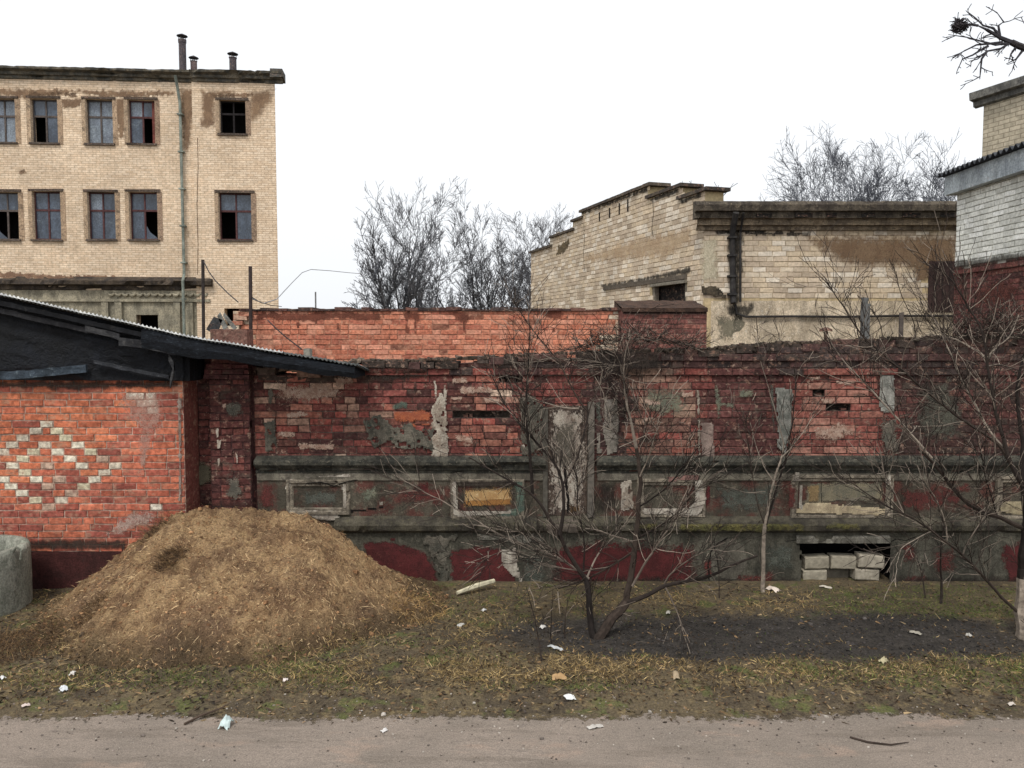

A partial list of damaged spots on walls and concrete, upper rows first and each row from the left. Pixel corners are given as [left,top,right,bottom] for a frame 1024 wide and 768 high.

leakage [251,90,270,119]
leakage [716,231,1024,341]
peeling [363,375,543,457]
peeling [364,505,712,582]